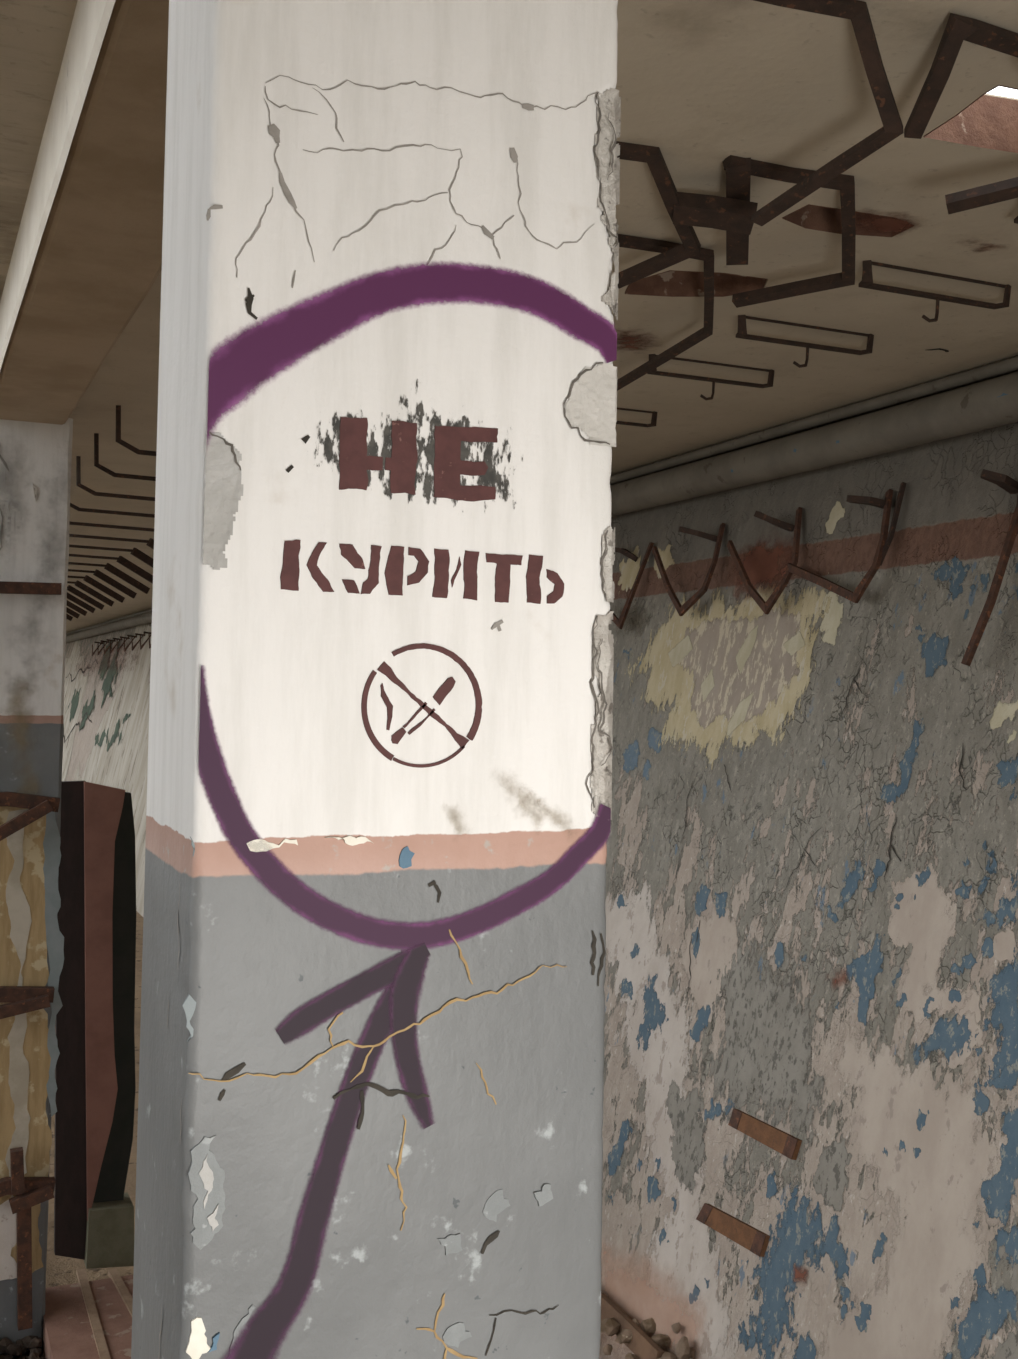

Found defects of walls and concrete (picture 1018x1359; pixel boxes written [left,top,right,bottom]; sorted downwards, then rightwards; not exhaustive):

spalling [924,85,1018,153]
crack [206,205,223,221]
crack [236,75,599,320]
rust [864,213,913,233]
rust [617,332,651,350]
spalling [564,362,617,447]
flaking render [586,527,844,820]
peeling [0,806,64,1178]
crack [188,880,605,1231]
peeling [605,841,1018,1359]
crack [481,1230,500,1254]
crack [416,1293,559,1359]